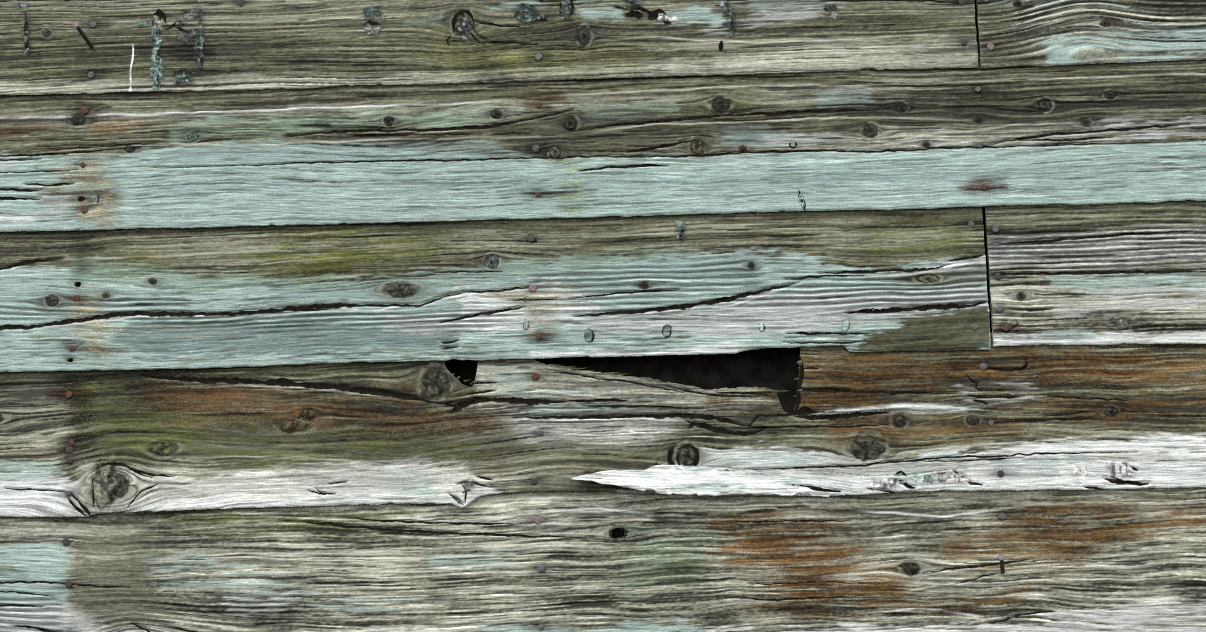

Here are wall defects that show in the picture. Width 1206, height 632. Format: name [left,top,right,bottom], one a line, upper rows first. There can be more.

crack [0,231,1206,467]
crack [6,463,173,516]
peeling [871,470,971,490]
crack [727,452,1149,523]
crack [717,581,891,601]